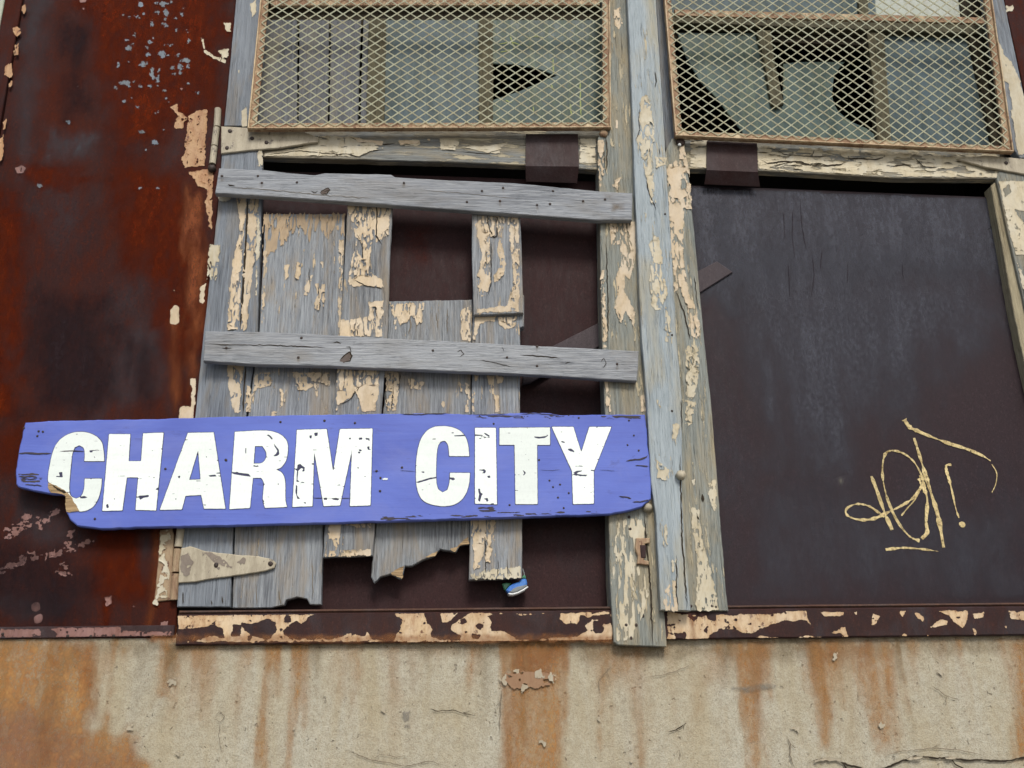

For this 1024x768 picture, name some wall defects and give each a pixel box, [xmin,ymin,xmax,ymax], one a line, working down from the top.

rust [76,0,227,145]
rust [113,166,206,403]
peeling [114,1,424,337]
peeling [460,216,520,342]
peeling [636,95,708,443]
peeling [757,146,1024,289]
rust [95,530,156,598]
peeling [0,614,380,643]
peeling [394,613,527,643]
peeling [663,480,813,639]
rust [507,639,563,768]
crack [787,737,1024,768]